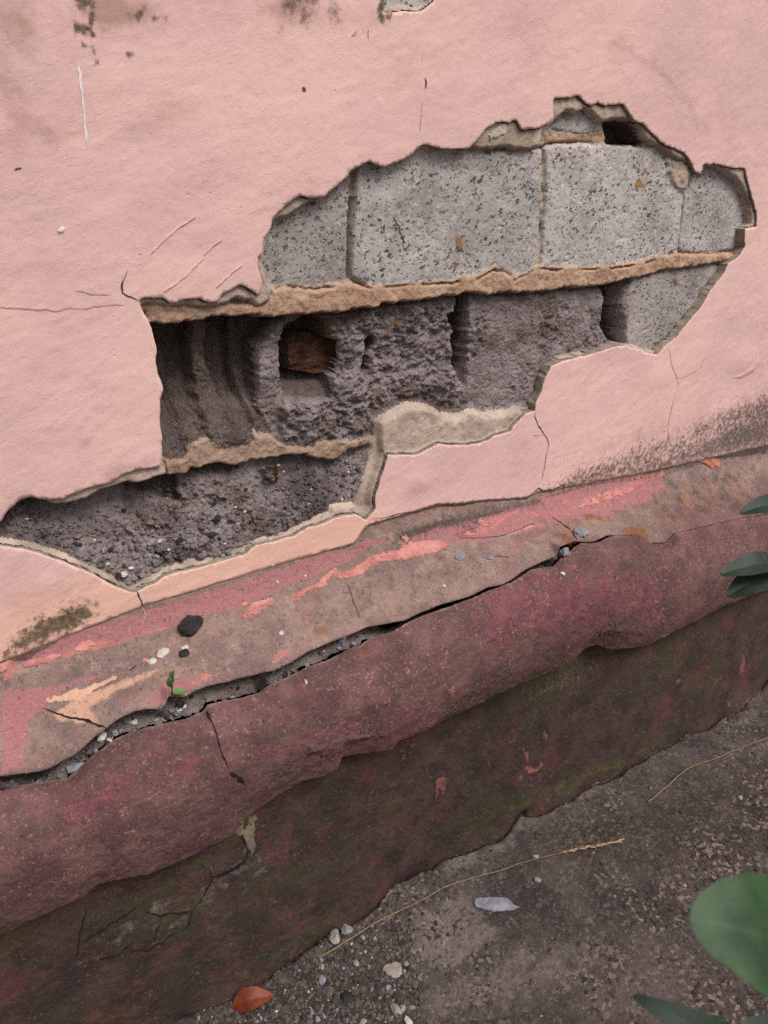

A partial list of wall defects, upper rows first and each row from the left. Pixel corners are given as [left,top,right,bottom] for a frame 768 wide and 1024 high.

spalling [383,0,432,13]
crack [0,270,139,312]
spalling [0,97,754,597]
crack [668,350,706,435]
crack [375,417,577,519]
mould [563,395,768,489]
mould [4,604,97,660]
peeling [242,597,275,616]
crack [0,518,577,791]
crack [76,829,249,960]